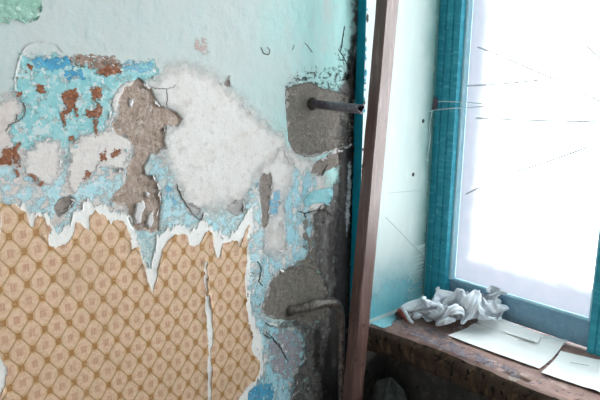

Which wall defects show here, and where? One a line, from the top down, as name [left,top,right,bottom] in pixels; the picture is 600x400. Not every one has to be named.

damp [285,0,358,104]
peeling [0,52,364,400]
crack [263,323,288,360]
damp [281,111,354,400]